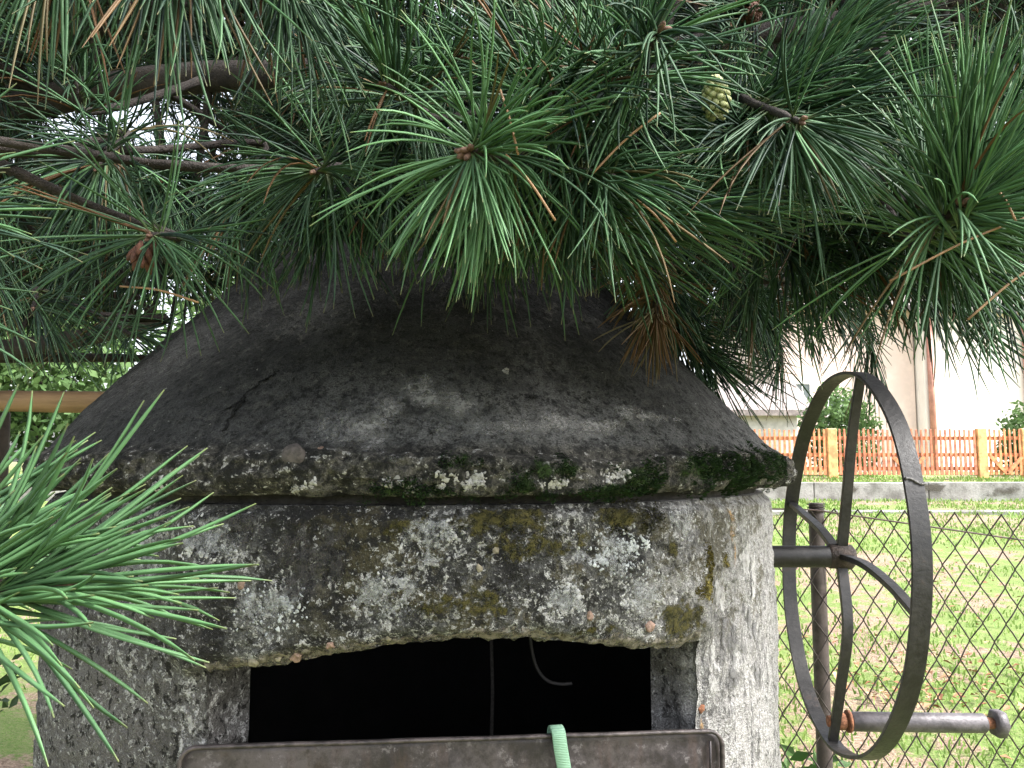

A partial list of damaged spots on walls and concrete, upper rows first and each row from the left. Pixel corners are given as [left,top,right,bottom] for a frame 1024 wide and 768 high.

crack [221,367,282,431]